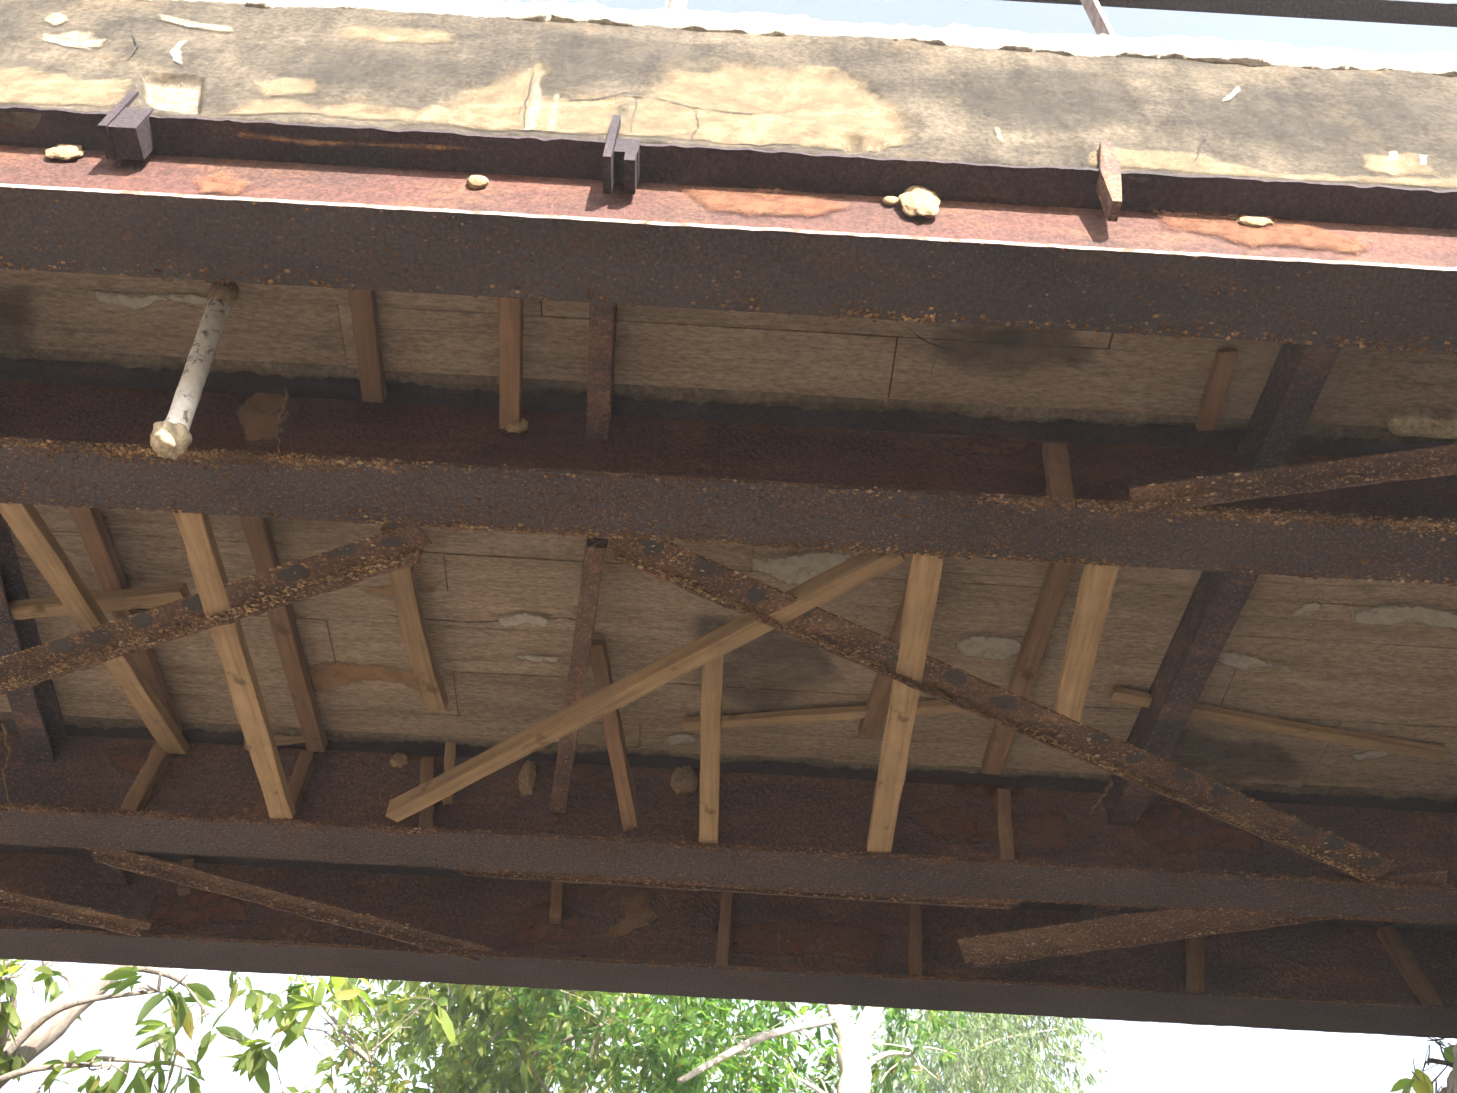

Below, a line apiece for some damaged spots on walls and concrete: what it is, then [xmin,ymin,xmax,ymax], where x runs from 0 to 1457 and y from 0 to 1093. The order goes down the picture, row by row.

spalling [621,67,905,153]
rust [0,172,1457,354]
rust [0,393,608,484]
rust [941,450,1457,541]
rust [0,511,1457,884]
leakage [723,629,829,694]